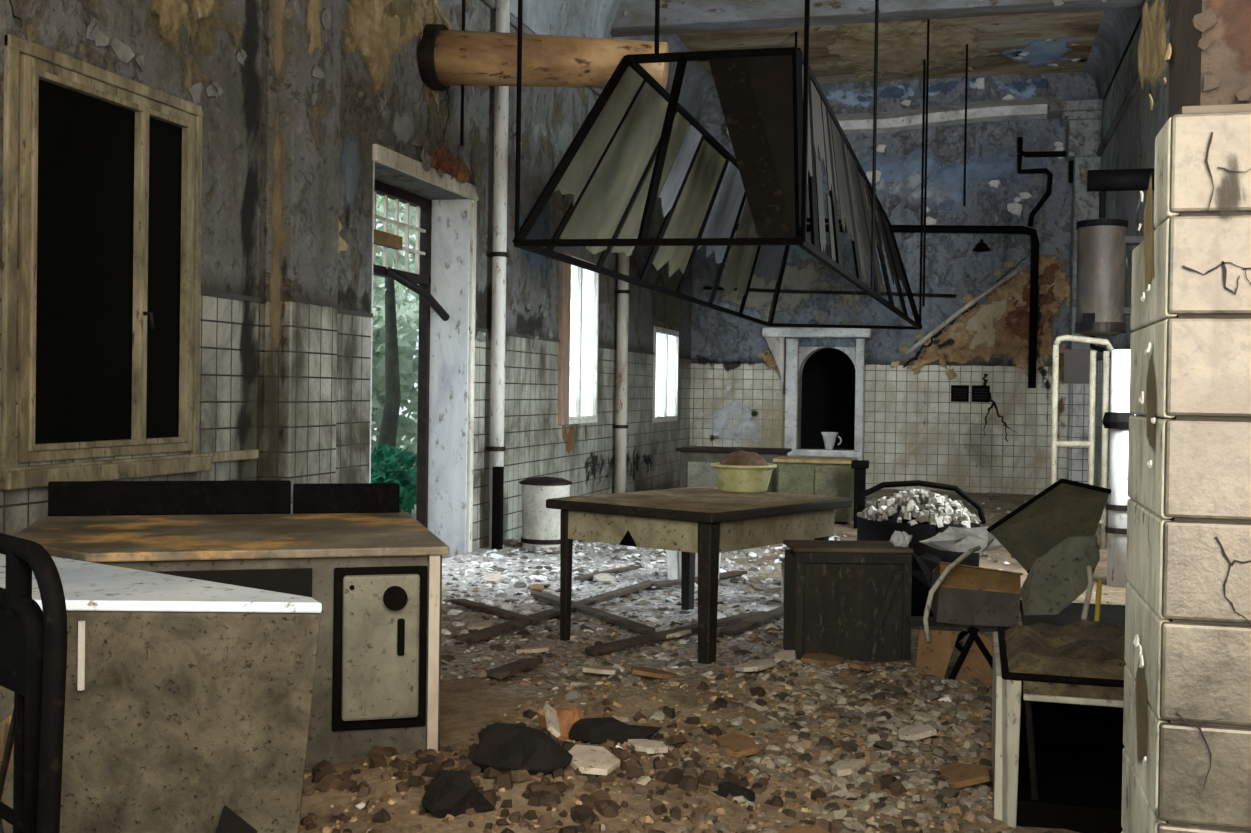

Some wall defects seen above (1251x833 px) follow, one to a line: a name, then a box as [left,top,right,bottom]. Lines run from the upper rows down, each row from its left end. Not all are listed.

peeling [826,38,1081,107]